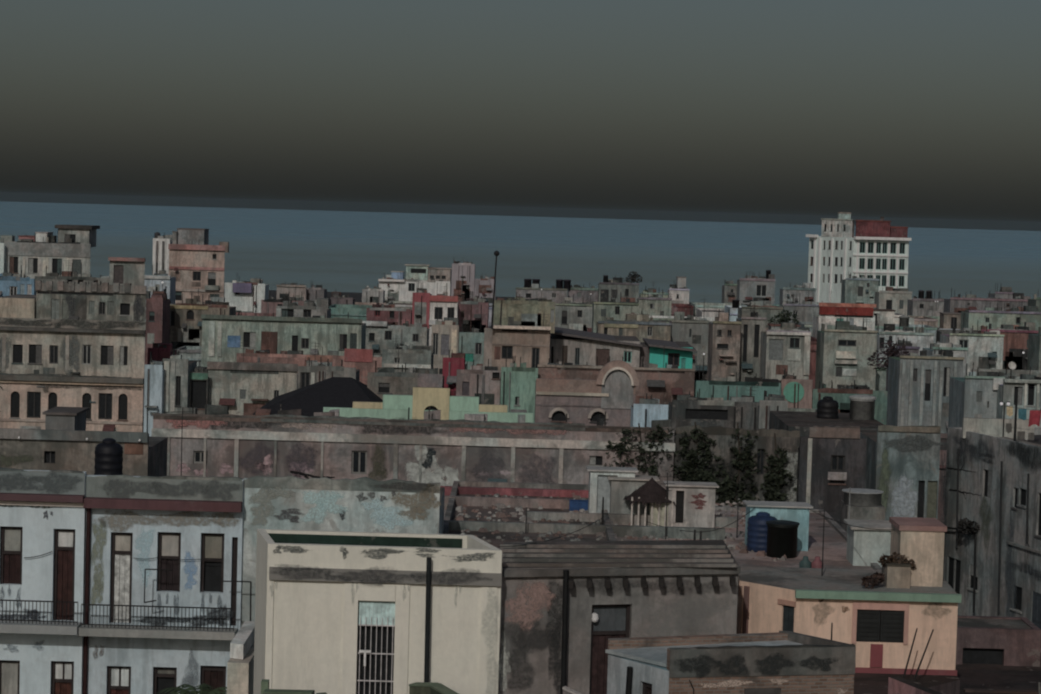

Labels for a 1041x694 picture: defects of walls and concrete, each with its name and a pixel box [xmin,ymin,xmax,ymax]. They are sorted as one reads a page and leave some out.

leakage [0,454,80,508]
peeling [249,486,302,526]
leakage [504,584,563,694]